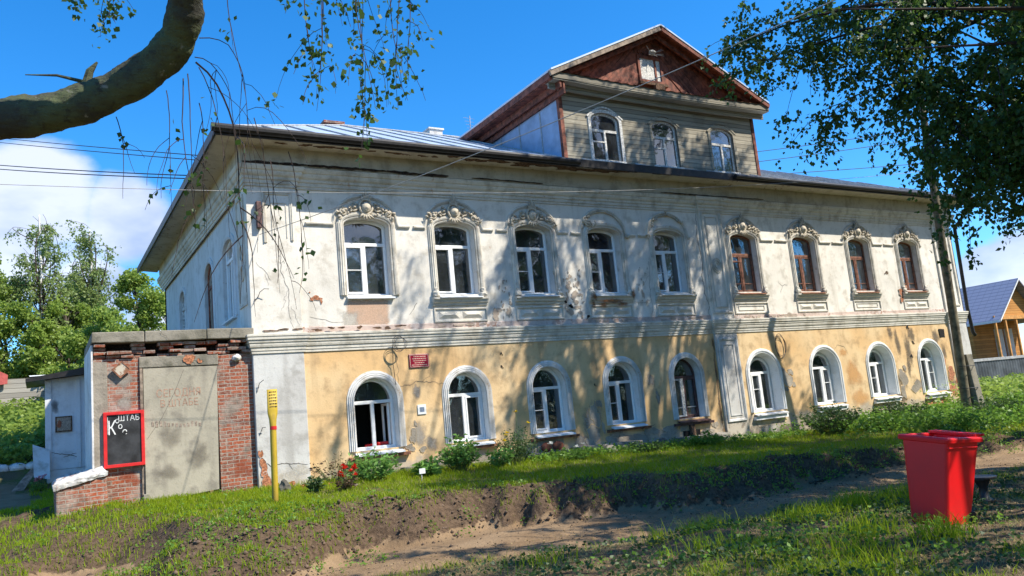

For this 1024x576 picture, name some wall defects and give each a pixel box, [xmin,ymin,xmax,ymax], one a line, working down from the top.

peeling [563,269,635,323]
spalling [258,450,296,487]